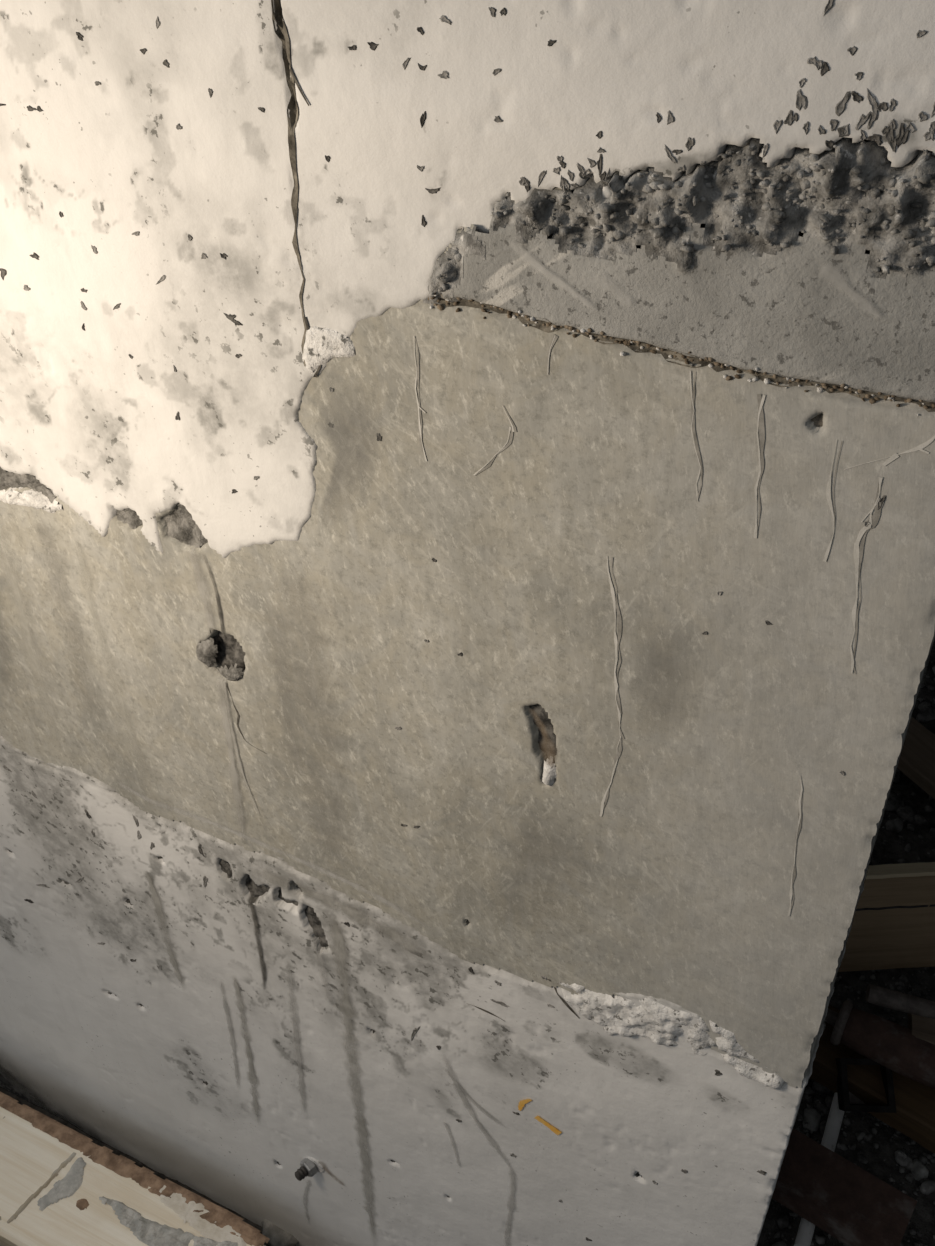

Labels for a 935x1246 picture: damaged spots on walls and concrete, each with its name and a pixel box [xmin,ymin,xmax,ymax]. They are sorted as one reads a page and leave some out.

crack [271,0,321,378]
spalling [499,131,654,204]
spalling [665,72,935,180]
spalling [807,56,829,76]
crack [428,292,935,674]
crack [225,683,266,754]
spalling [0,215,935,1089]
crack [598,557,624,817]
leakage [248,896,266,986]
leakage [223,981,259,1113]
leakage [315,923,374,1232]
leakage [446,1062,515,1246]